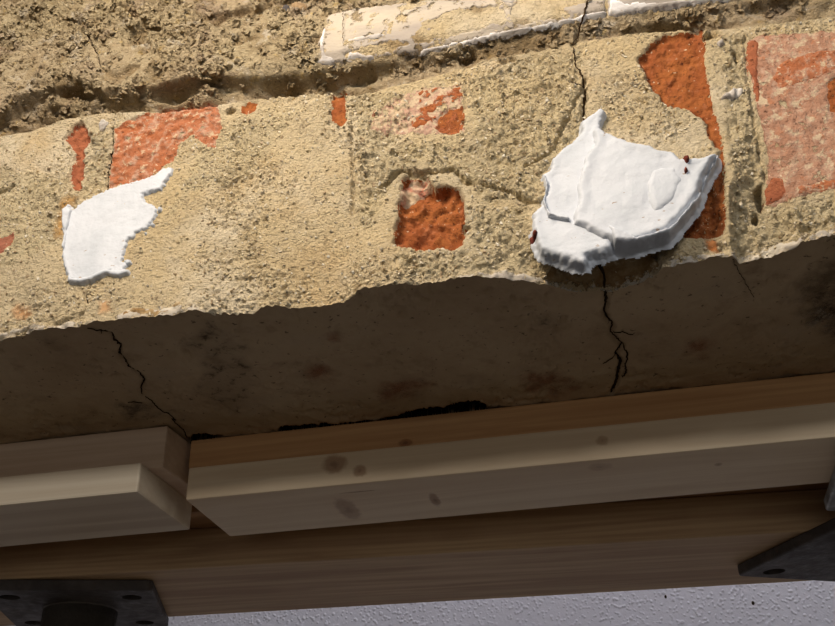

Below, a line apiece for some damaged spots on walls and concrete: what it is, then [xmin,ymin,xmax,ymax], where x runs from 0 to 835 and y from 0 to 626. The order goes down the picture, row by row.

flaking render [317,0,730,68]
crack [568,0,589,121]
leakage [57,199,74,235]
crack [106,131,114,190]
spalling [109,103,222,188]
spalling [394,179,468,251]
spalling [637,30,727,239]
peeling [745,30,835,213]
crack [60,287,187,437]
crack [598,264,633,392]